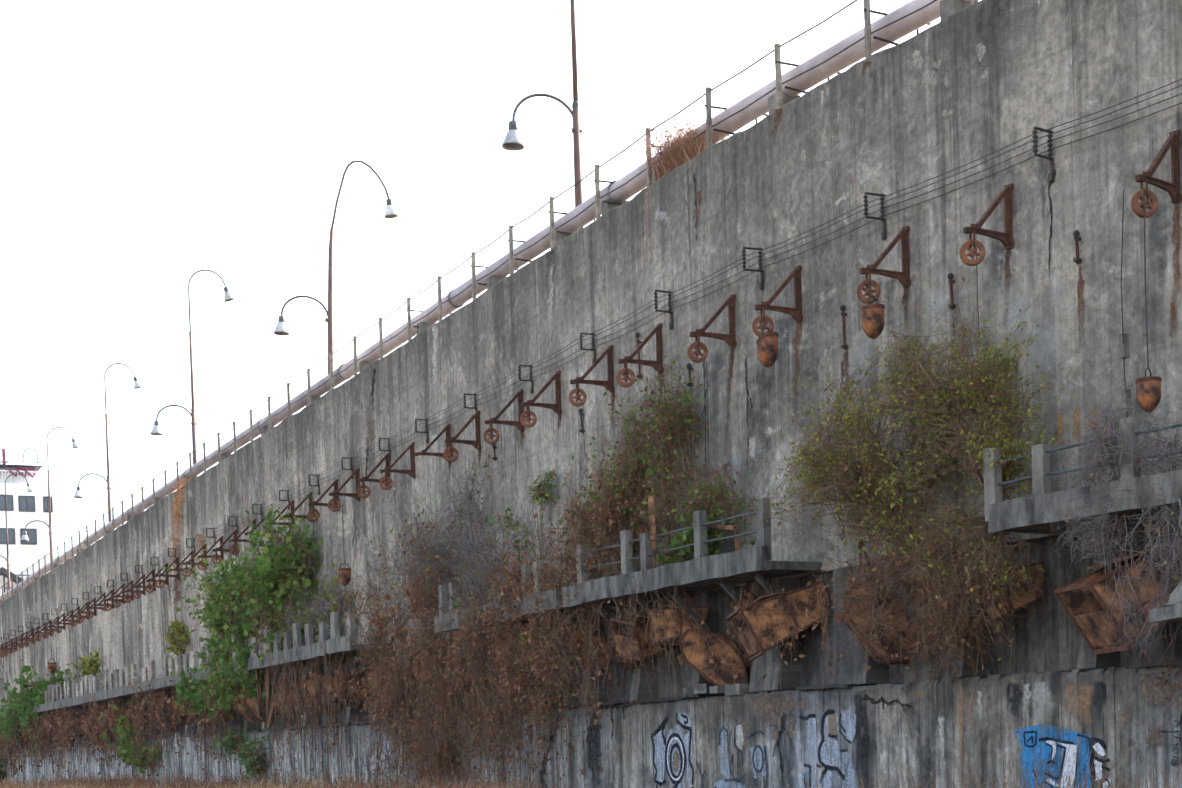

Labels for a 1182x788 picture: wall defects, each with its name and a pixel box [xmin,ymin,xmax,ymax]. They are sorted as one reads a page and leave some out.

corrosion [1171,205,1181,324]
corrosion [172,475,191,527]
corrosion [167,540,181,605]
crack [861,694,911,712]